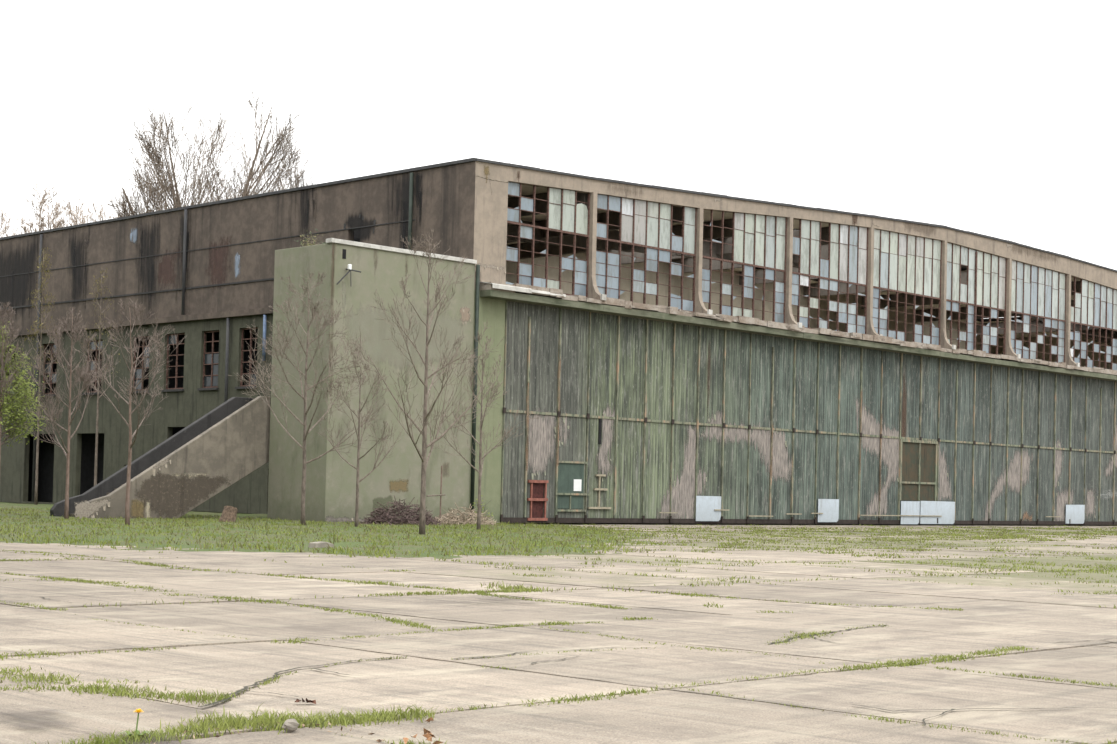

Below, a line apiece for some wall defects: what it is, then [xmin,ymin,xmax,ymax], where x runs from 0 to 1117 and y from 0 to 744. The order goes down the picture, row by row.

leakage [0,240,38,314]
leakage [71,235,87,300]
leakage [130,225,160,300]
peeling [523,408,570,480]
peeling [657,410,792,524]
peeling [856,398,899,519]
peeling [982,449,1033,521]
peeling [1051,422,1117,521]